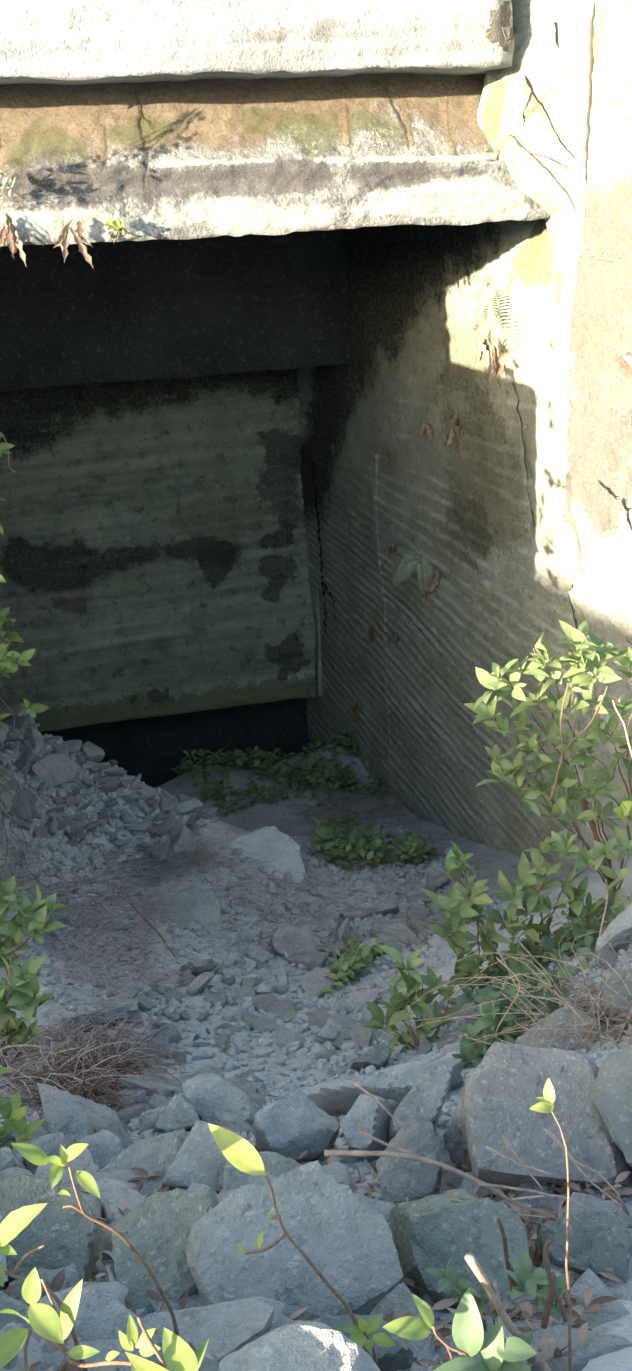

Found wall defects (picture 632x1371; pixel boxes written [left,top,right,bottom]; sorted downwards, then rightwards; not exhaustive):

crack [134,88,153,205]
crack [510,0,595,215]
damp [0,222,503,614]
damp [505,174,632,575]